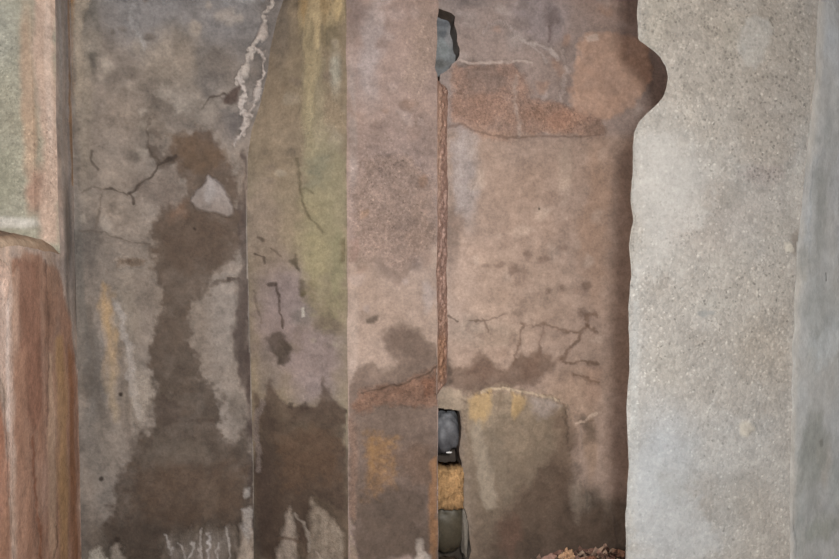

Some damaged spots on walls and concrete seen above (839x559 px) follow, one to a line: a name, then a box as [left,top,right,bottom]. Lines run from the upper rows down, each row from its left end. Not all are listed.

damp [71,0,92,117]
crack [77,117,179,247]
damp [75,0,437,559]
rust [0,247,82,559]
crack [447,310,601,385]